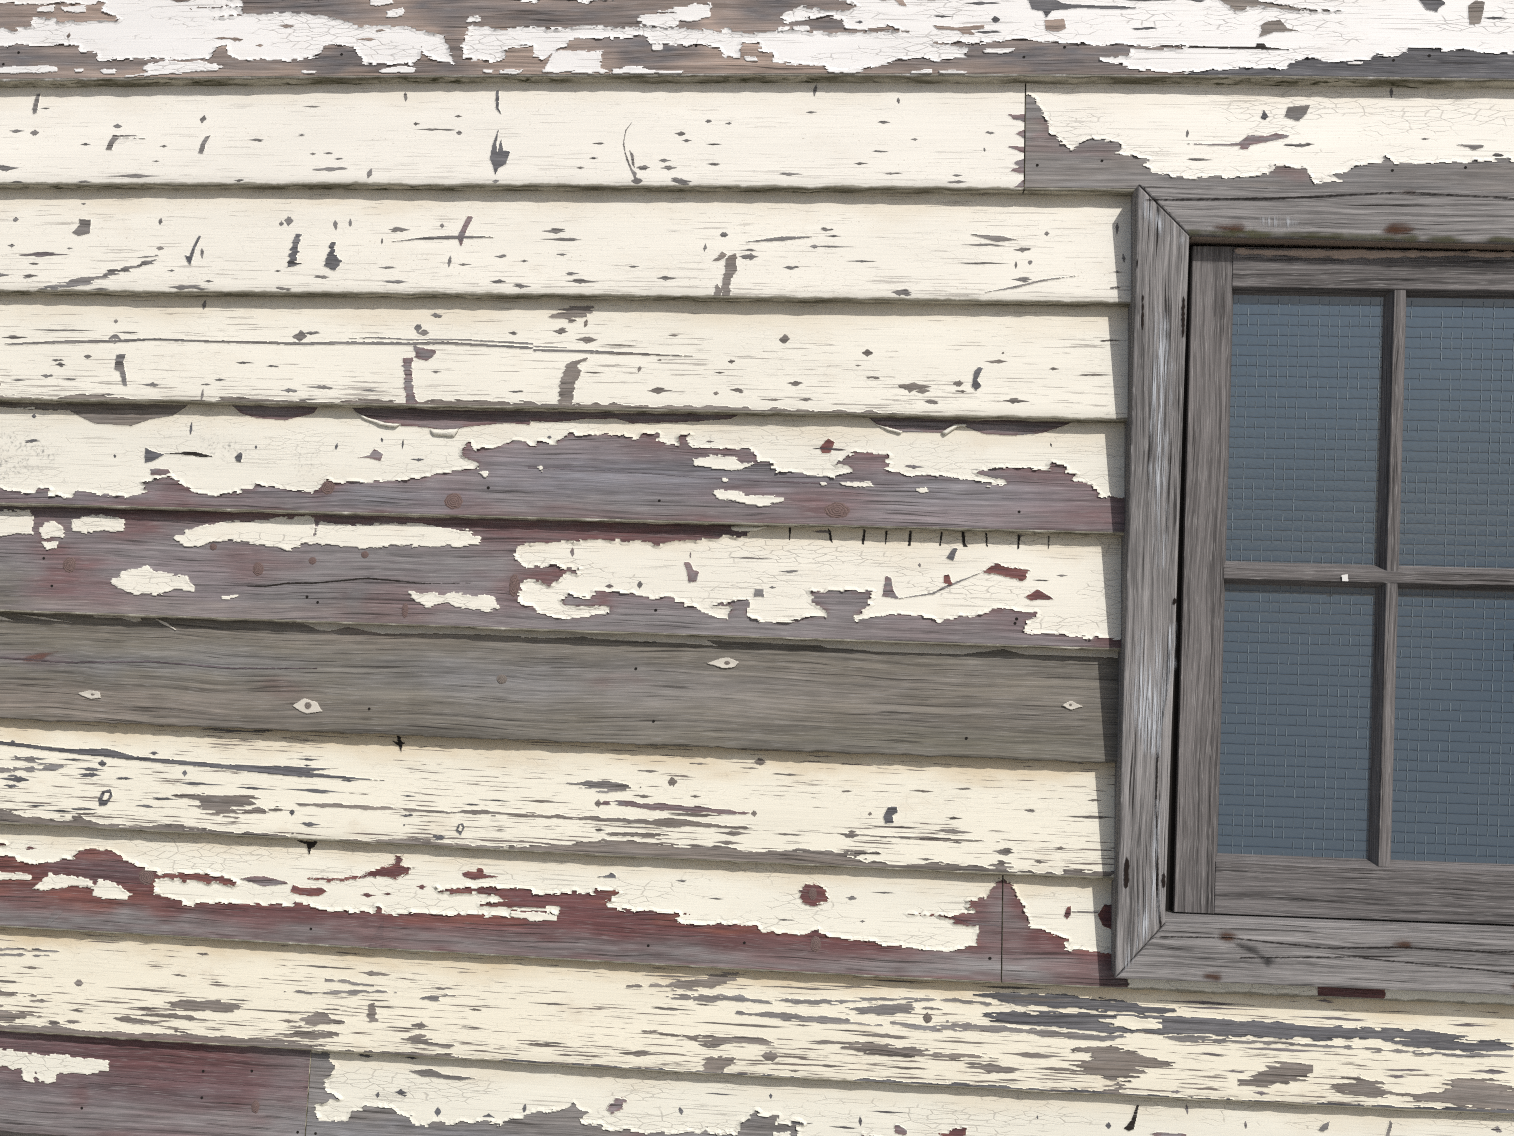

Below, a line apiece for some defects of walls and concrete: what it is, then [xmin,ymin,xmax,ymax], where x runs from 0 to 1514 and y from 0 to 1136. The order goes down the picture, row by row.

peeling [0,0,1514,192]
peeling [167,235,212,310]
peeling [276,216,352,290]
peeling [440,215,474,267]
peeling [544,228,598,284]
peeling [703,232,759,295]
peeling [811,227,869,262]
peeling [963,243,1032,282]
peeling [0,305,1124,648]
peeling [0,740,1514,1136]